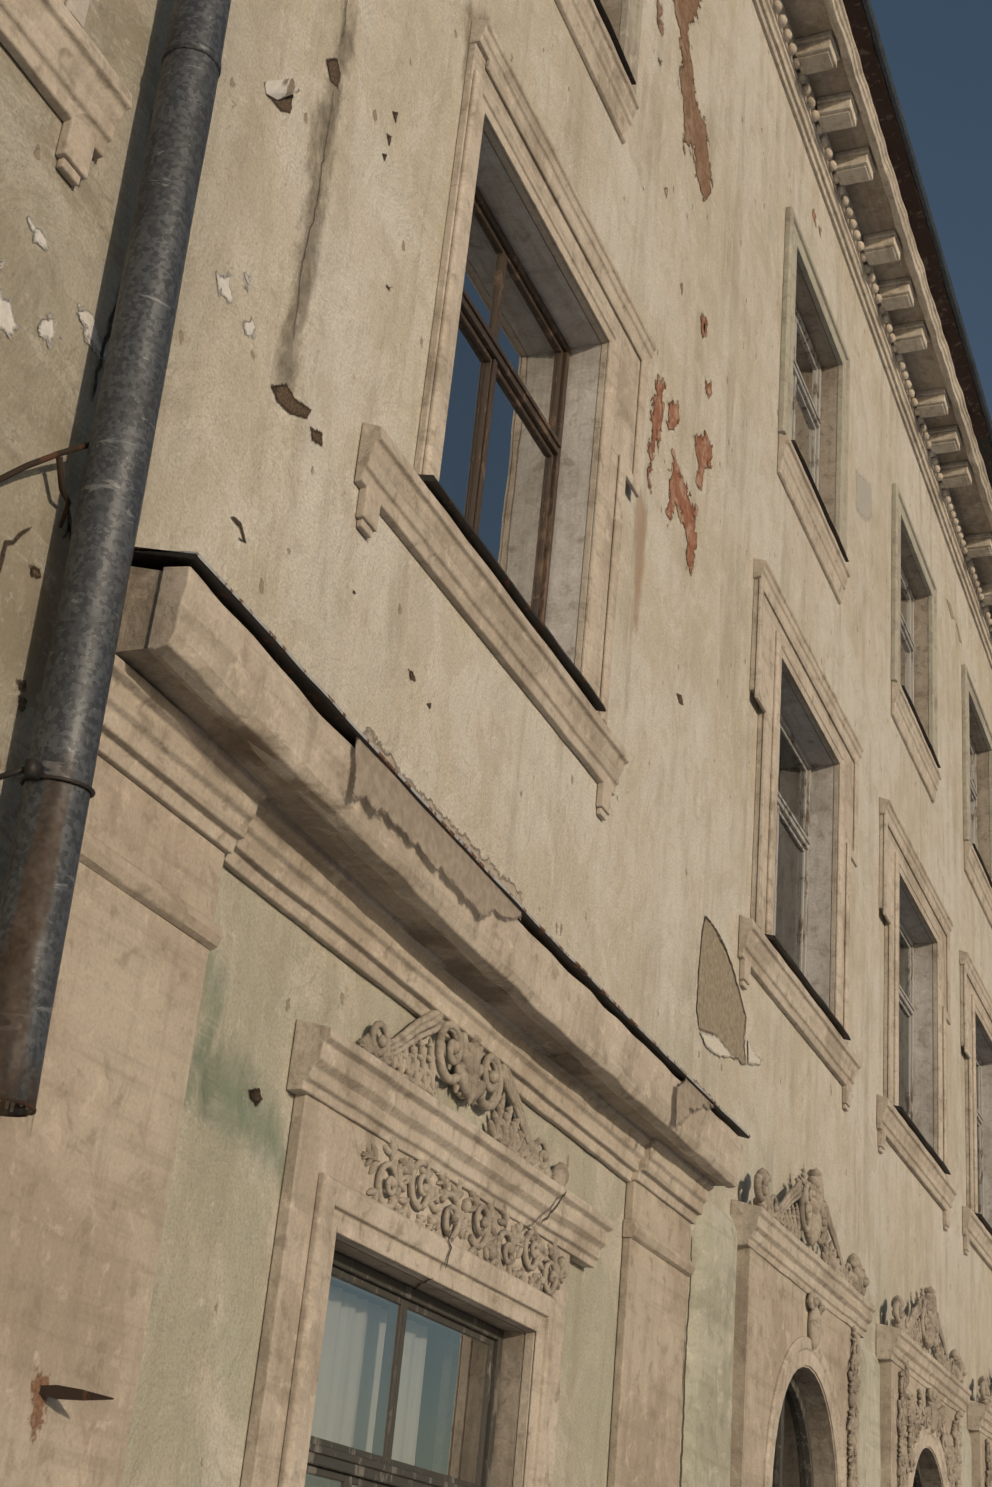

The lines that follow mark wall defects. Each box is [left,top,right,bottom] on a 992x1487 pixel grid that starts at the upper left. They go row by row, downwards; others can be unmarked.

flaking render [655,0,713,202]
peeling [27,216,48,251]
peeling [0,259,63,350]
peeling [74,301,108,361]
crack [92,303,117,399]
flaking render [700,311,708,339]
flaking render [647,375,714,575]
crack [0,495,72,578]
crack [16,679,27,712]
spalling [696,916,763,1066]
spalling [675,1078,714,1133]